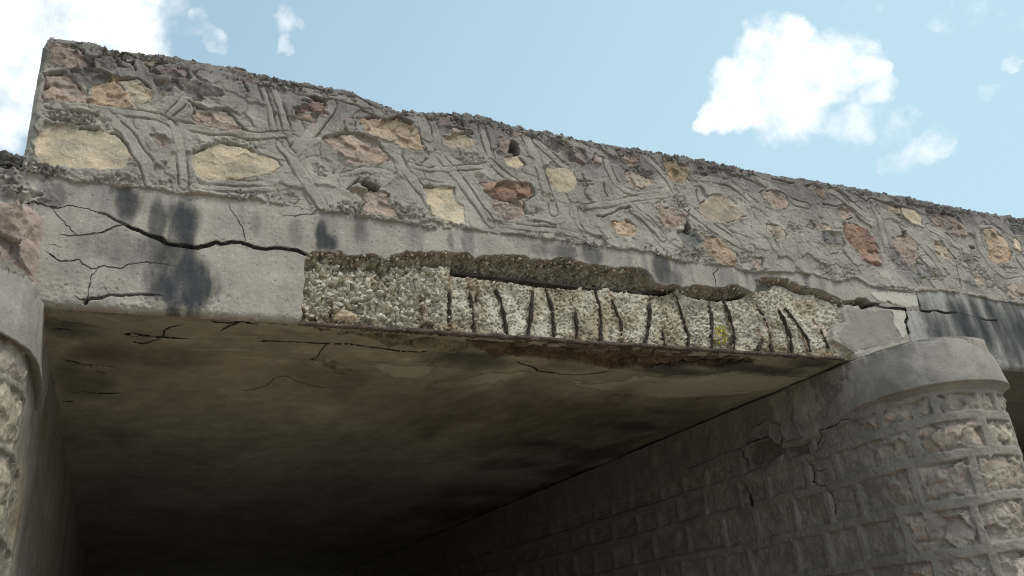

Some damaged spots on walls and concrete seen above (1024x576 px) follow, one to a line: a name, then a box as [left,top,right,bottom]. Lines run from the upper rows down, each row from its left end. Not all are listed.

water stain [118,188,137,217]
crack [20,200,306,303]
water stain [151,202,212,315]
crack [125,324,183,345]
crack [211,321,427,391]
spalling [299,250,880,398]
crack [864,299,994,334]
crack [677,419,849,516]